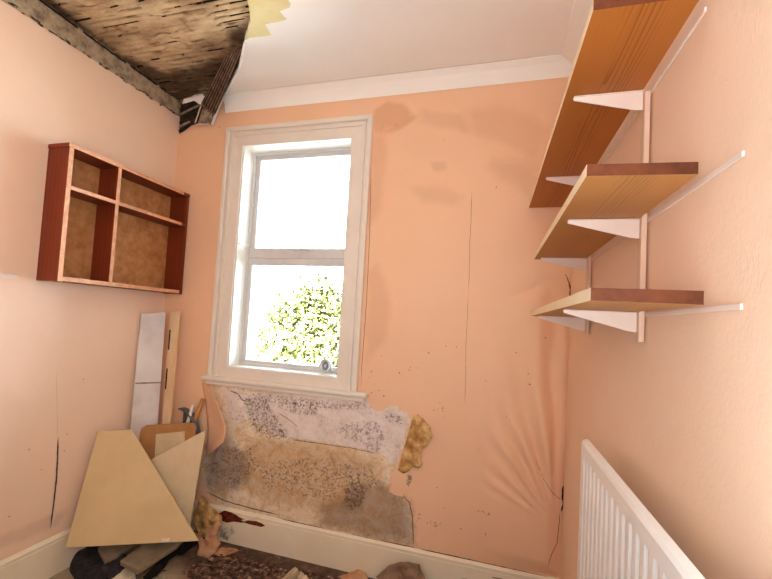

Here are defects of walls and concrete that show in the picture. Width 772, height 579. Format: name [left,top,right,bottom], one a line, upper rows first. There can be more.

spalling [8,2,179,116]
peeling [201,383,432,545]